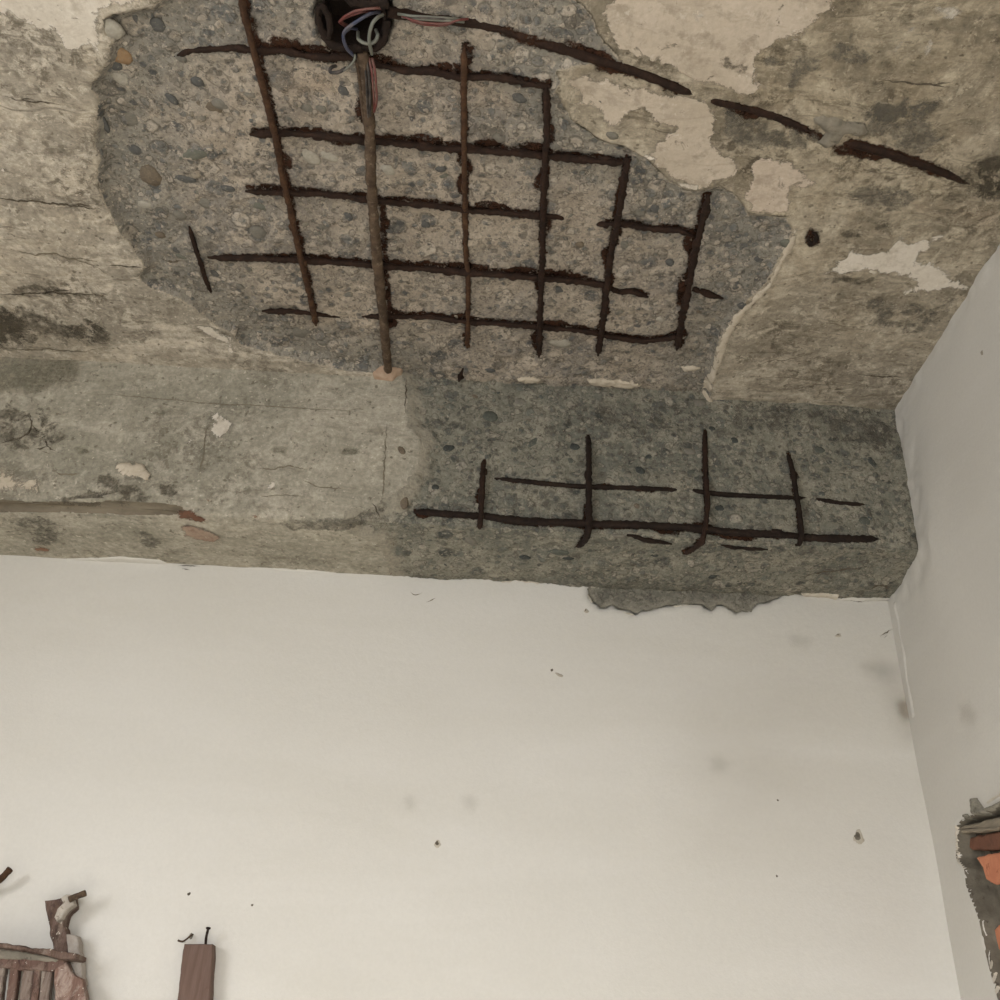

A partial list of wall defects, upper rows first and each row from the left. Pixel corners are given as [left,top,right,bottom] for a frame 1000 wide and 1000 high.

rust [223,0,713,355]
rust [720,101,824,140]
rust [832,138,949,178]
spalling [0,0,918,616]
rust [648,455,757,555]
spalling [955,793,1000,1000]